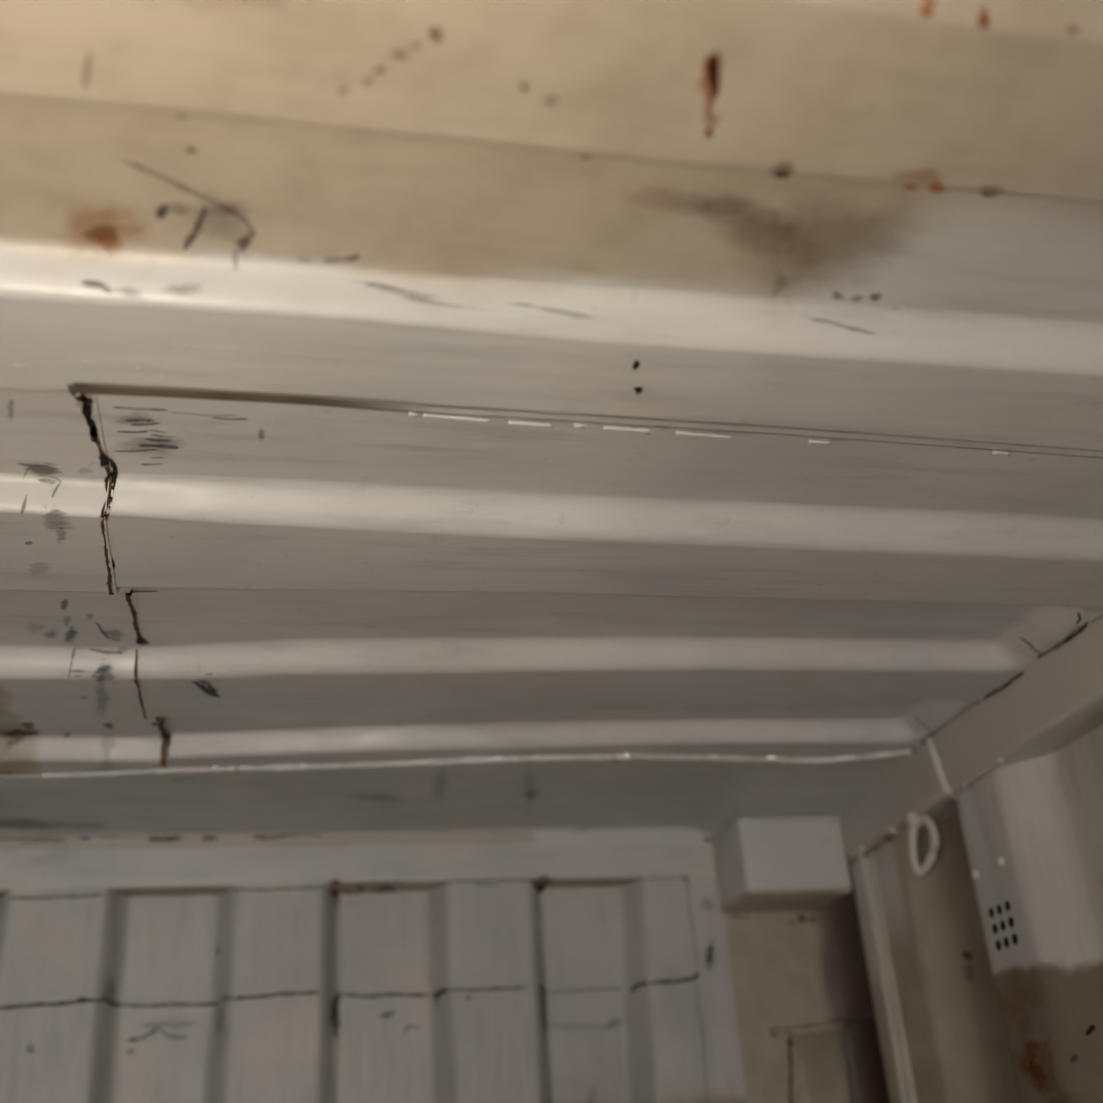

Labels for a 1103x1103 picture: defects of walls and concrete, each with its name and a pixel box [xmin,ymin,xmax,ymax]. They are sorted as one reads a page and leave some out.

rust [704,54,719,98]
crack [72,393,169,764]
crack [1064,613,1088,643]
crack [913,637,1041,754]
crack [0,986,528,1009]
crack [631,972,699,992]